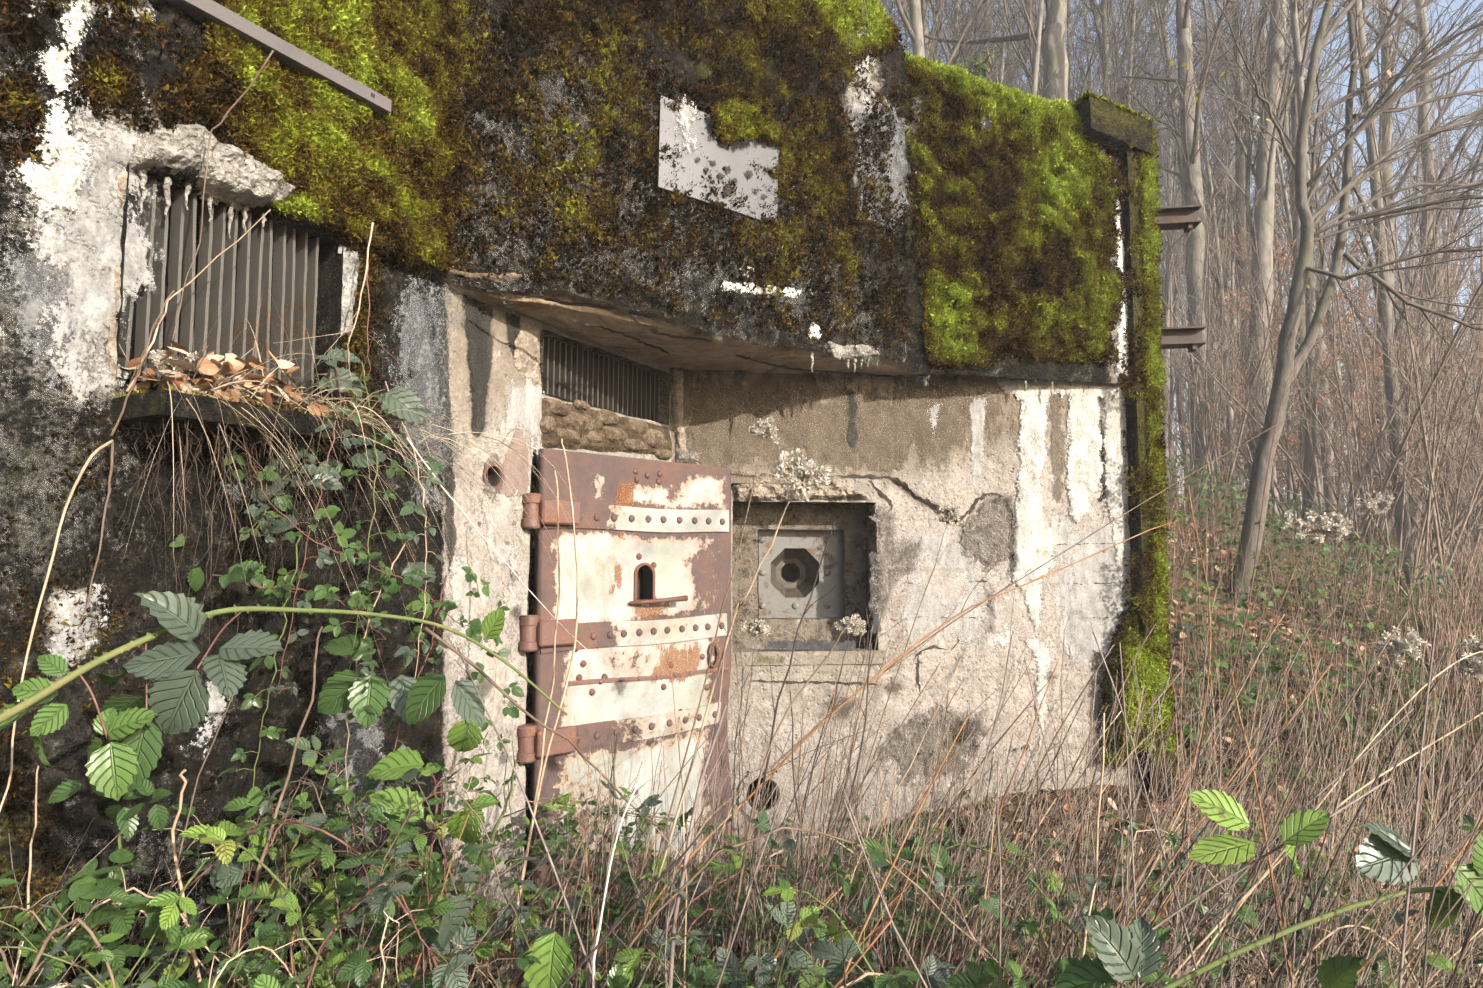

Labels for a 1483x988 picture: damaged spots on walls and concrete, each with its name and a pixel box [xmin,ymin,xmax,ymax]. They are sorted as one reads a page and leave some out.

peeling [0,66,160,411]
water stain [381,272,545,573]
rust [612,480,634,507]
crack [731,468,786,477]
water stain [669,200,1132,743]
rust [612,564,622,593]
rust [635,597,672,621]
spalling [732,470,1019,667]
crack [828,474,1014,717]
crack [1055,582,1126,618]
rust [651,642,701,684]
crack [749,678,879,686]